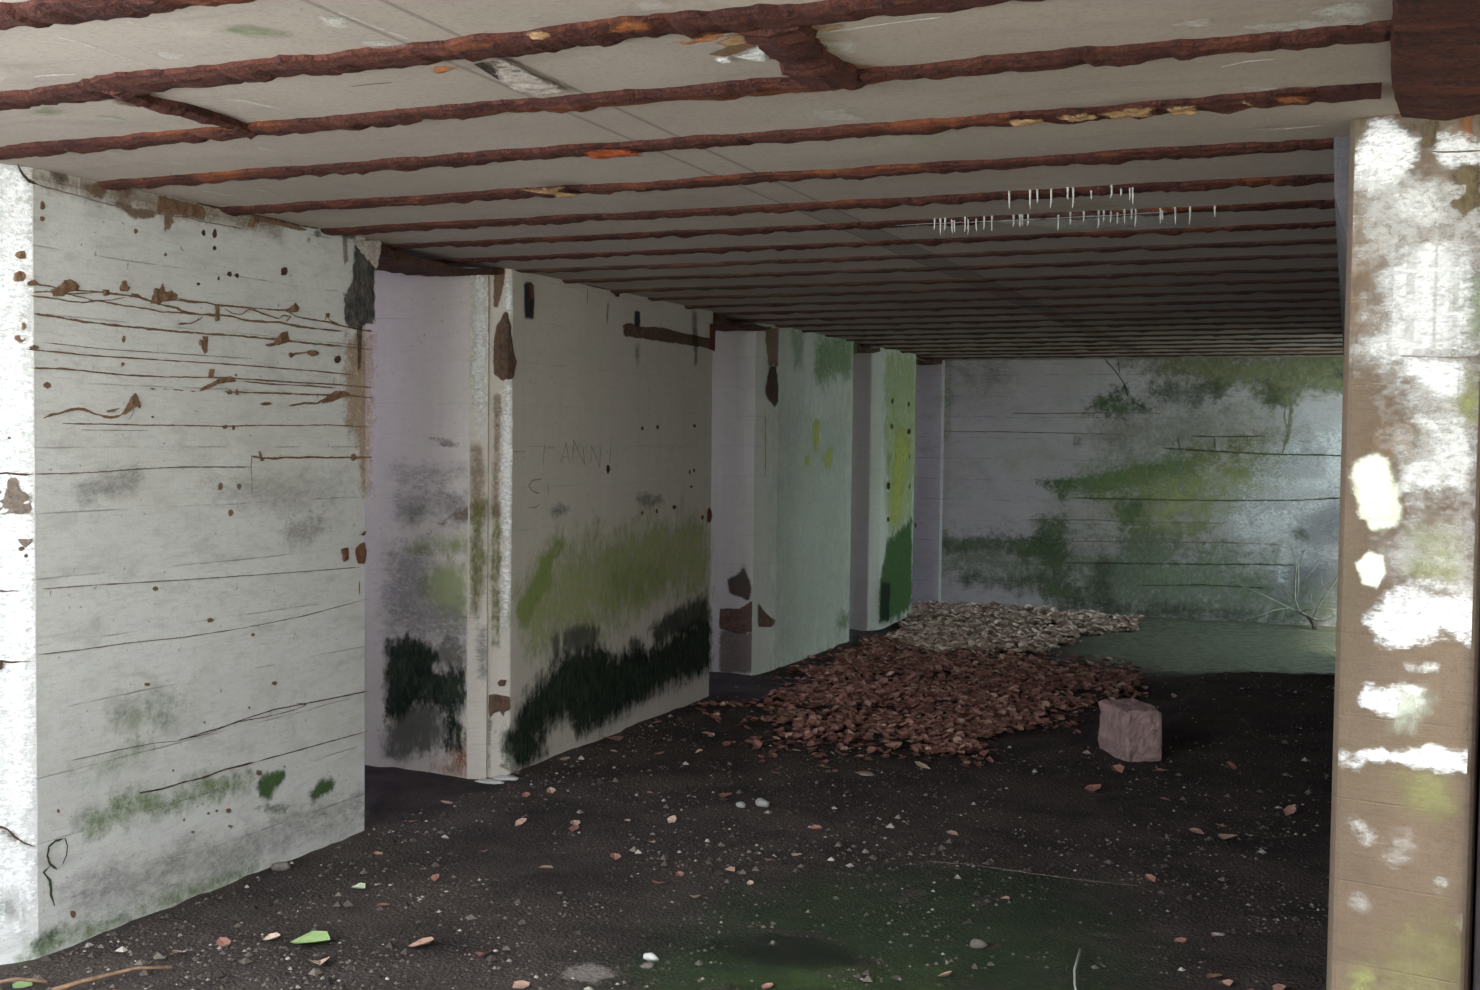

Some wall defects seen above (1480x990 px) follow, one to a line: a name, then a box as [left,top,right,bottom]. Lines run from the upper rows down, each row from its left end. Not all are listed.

peeling [14,251,26,282]
spalling [344,239,382,370]
spalling [493,312,517,381]
water stain [898,185,1191,236]
water stain [1351,198,1416,276]
peeling [1351,118,1480,530]
water stain [383,553,467,759]
water stain [502,597,713,769]
water stain [727,569,751,600]
spalling [719,601,775,673]
peeling [1356,552,1473,649]
water stain [1341,744,1468,774]